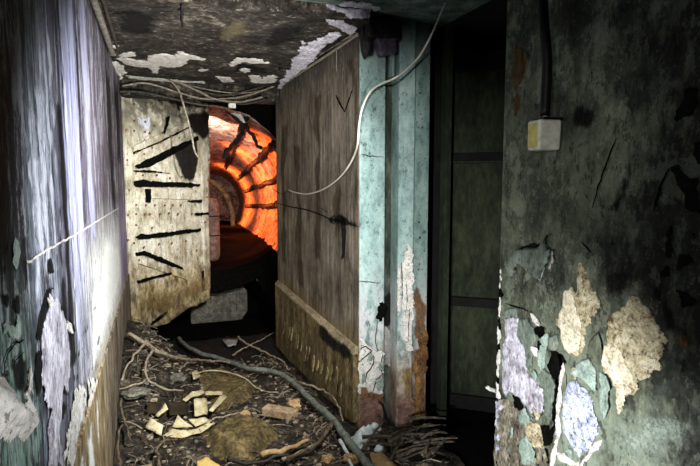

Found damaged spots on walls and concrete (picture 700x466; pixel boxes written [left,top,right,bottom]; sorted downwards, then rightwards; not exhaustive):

peeling [110,41,209,84]
peeling [215,1,380,89]
peeling [1,291,21,340]
peeling [4,237,21,274]
peeling [35,286,98,466]
crack [277,203,359,227]
peeling [358,302,390,394]
peeling [397,244,415,352]
rust [403,246,428,424]
peeling [493,262,668,466]